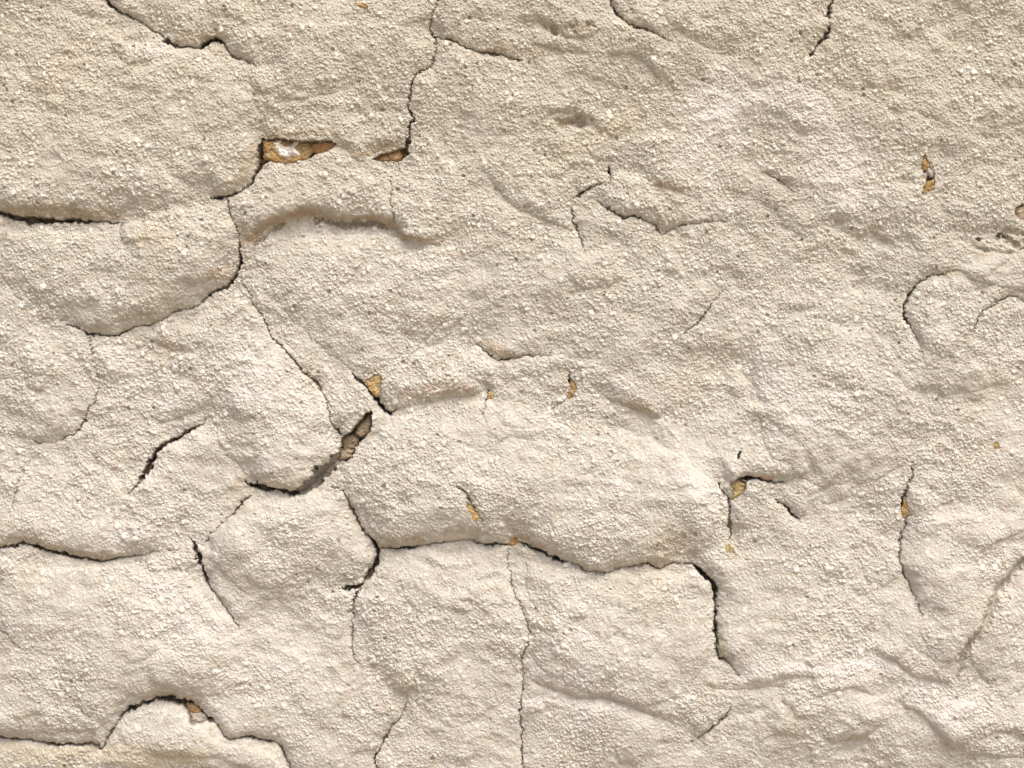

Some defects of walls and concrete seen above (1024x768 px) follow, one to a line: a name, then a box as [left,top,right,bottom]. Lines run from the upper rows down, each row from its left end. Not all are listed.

crack [105,0,259,67]
crack [809,0,834,58]
crack [389,0,522,224]
spalling [256,137,337,170]
spalling [921,154,936,197]
spalling [365,373,383,397]
spalling [338,410,373,463]
crack [0,138,740,768]
spalling [730,478,747,501]
crack [718,475,800,543]
crack [897,467,924,616]
crack [953,557,1024,682]